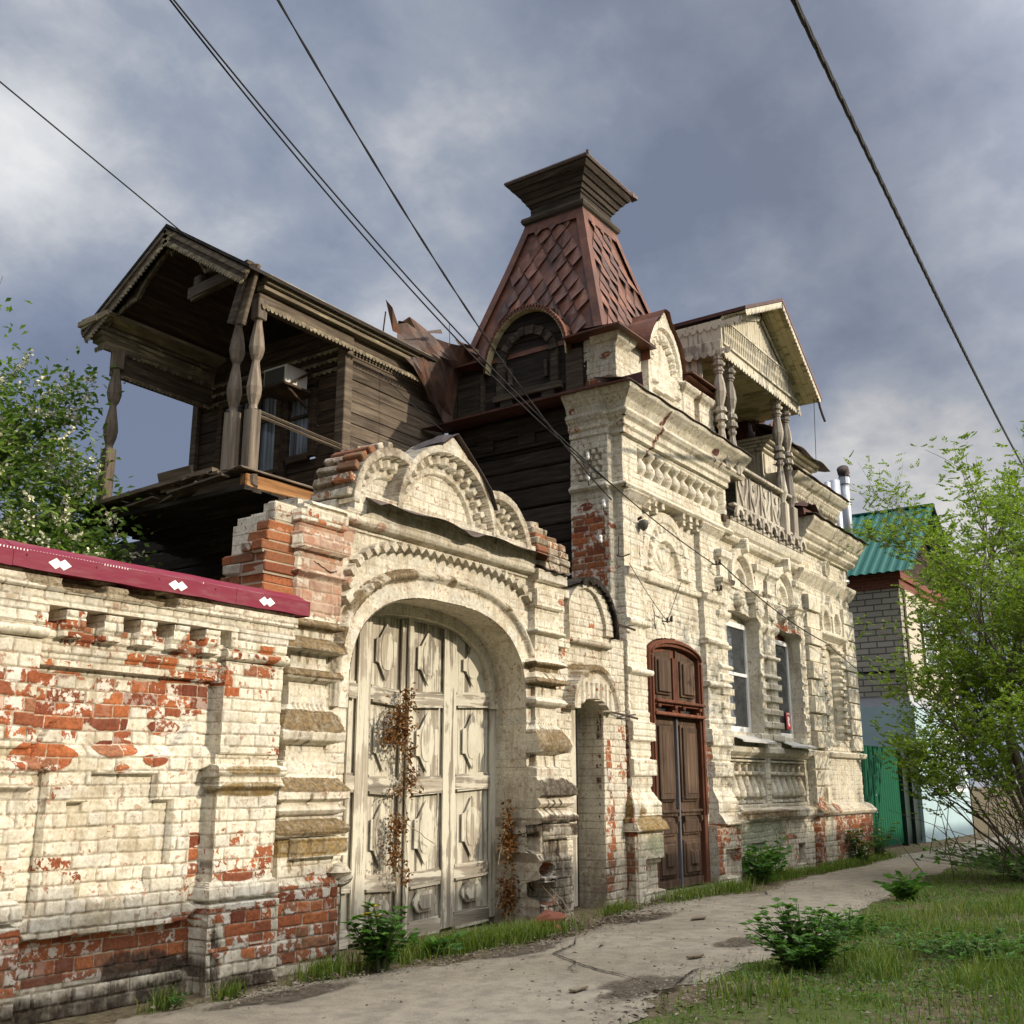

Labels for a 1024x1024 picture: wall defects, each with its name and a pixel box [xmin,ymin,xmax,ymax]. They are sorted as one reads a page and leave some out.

peeling [269,511,361,622]
peeling [571,502,616,586]
peeling [0,649,280,774]
peeling [605,739,633,896]
peeling [812,797,875,868]
peeling [0,870,338,999]